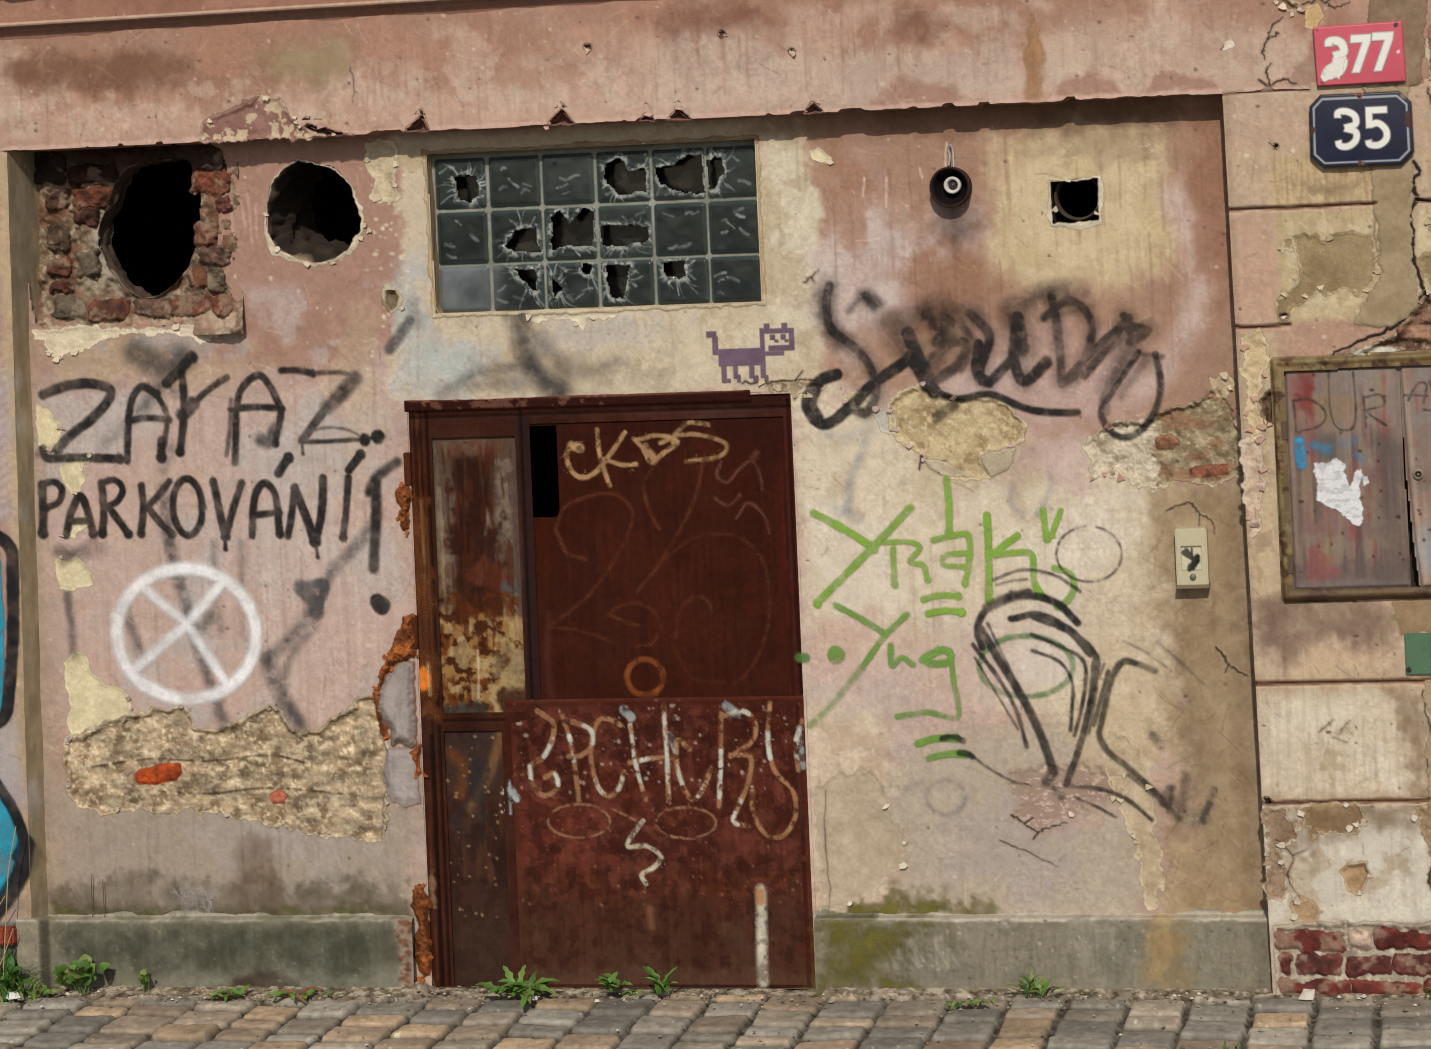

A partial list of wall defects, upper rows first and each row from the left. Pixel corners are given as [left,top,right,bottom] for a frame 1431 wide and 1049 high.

peeling [1273,0,1325,29]
crack [1258,0,1350,87]
flaking render [31,94,430,362]
spalling [1274,230,1382,324]
spalling [1328,251,1431,355]
crack [1332,160,1431,355]
spalling [758,378,826,398]
spalling [841,381,1028,482]
spalling [1082,327,1274,538]
spalling [62,651,390,843]
flaking render [1260,796,1431,995]